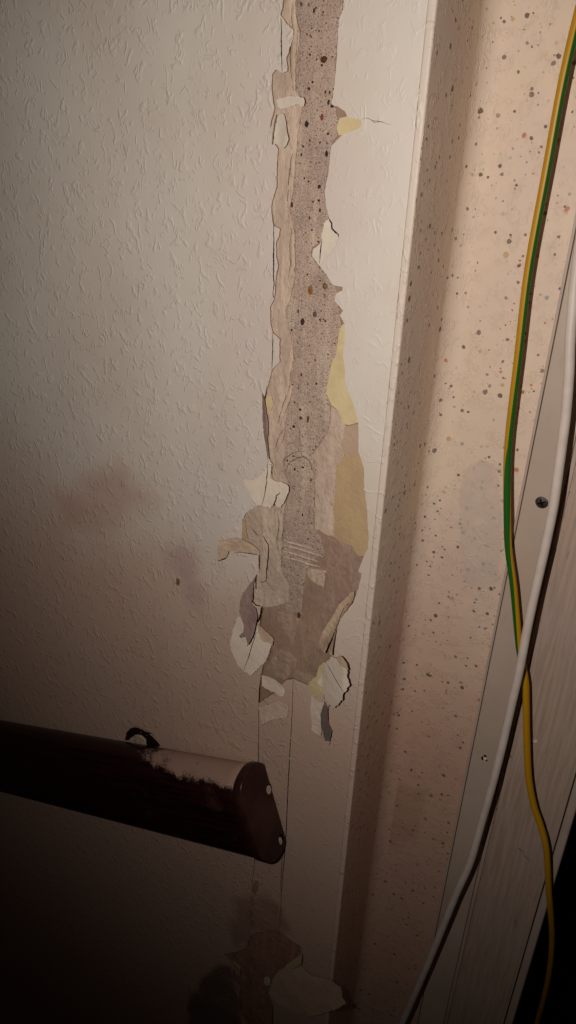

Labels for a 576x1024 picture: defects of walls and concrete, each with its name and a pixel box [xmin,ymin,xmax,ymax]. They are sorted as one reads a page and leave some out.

flaking render [242,0,369,701]
flaking render [224,929,302,1024]